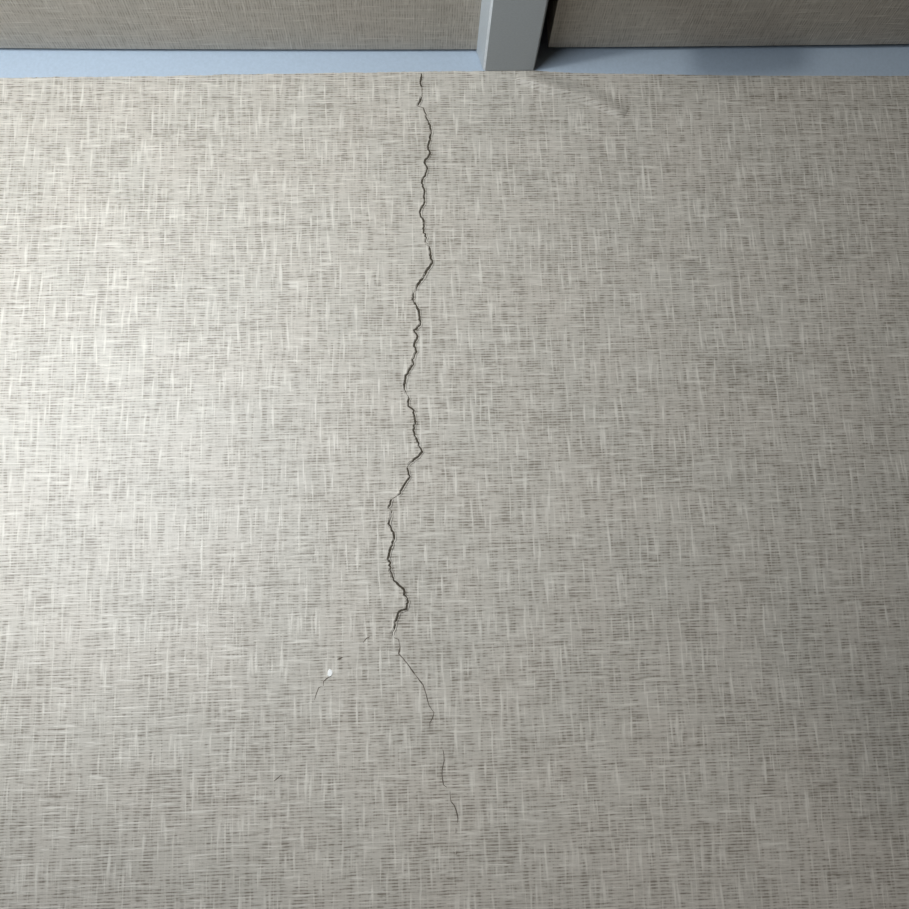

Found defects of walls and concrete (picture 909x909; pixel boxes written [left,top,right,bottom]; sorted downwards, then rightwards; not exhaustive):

crack [364,73,434,722]
crack [441,742,458,854]